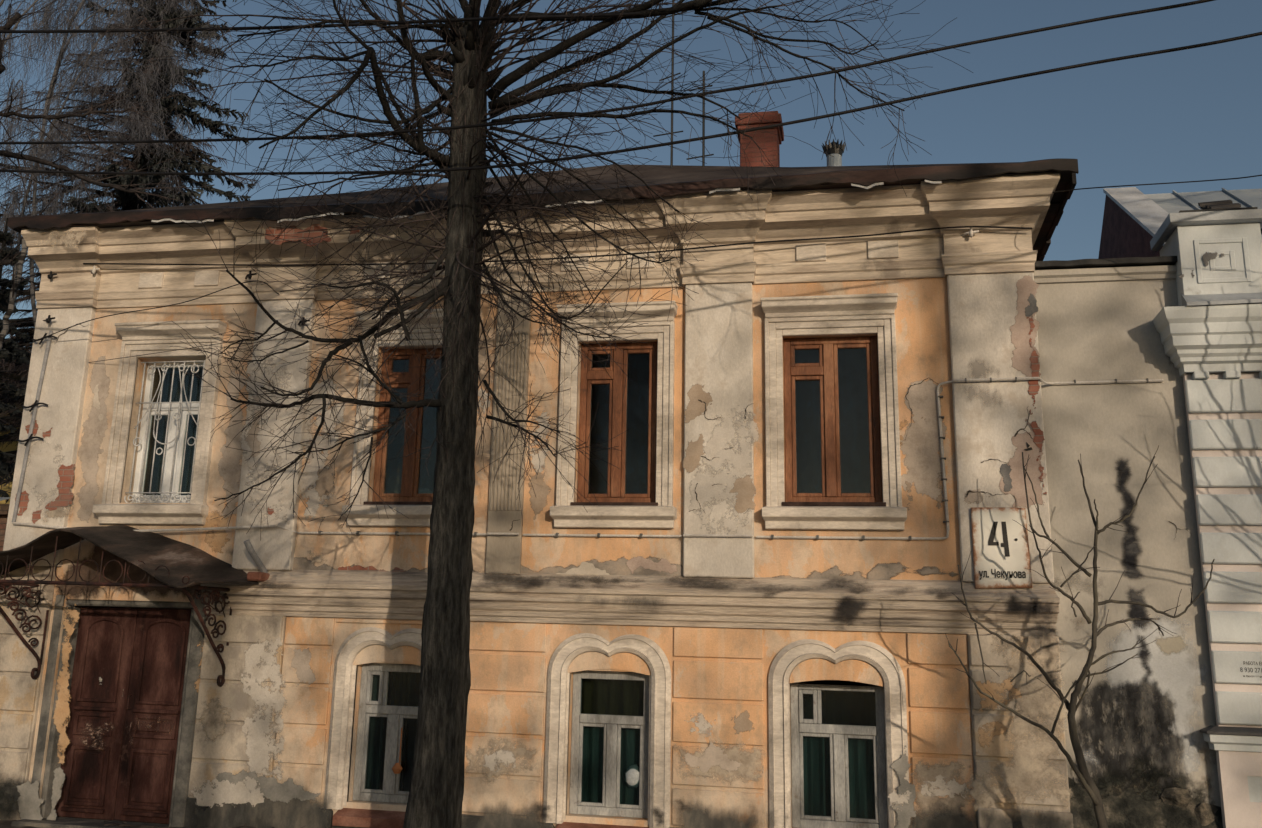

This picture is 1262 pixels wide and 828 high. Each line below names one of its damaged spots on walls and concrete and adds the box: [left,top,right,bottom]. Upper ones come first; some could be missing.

peeling [1179,252,1224,278]
flaking render [15,356,110,524]
flaking render [683,384,759,535]
flaking render [964,275,1047,508]
flaking render [293,553,428,572]
flaking render [521,556,683,576]
flaking render [772,562,960,581]
damp [1070,460,1209,804]
peeling [190,635,316,808]
peeling [465,739,536,782]
peeling [675,711,762,783]
peeling [888,634,1070,814]